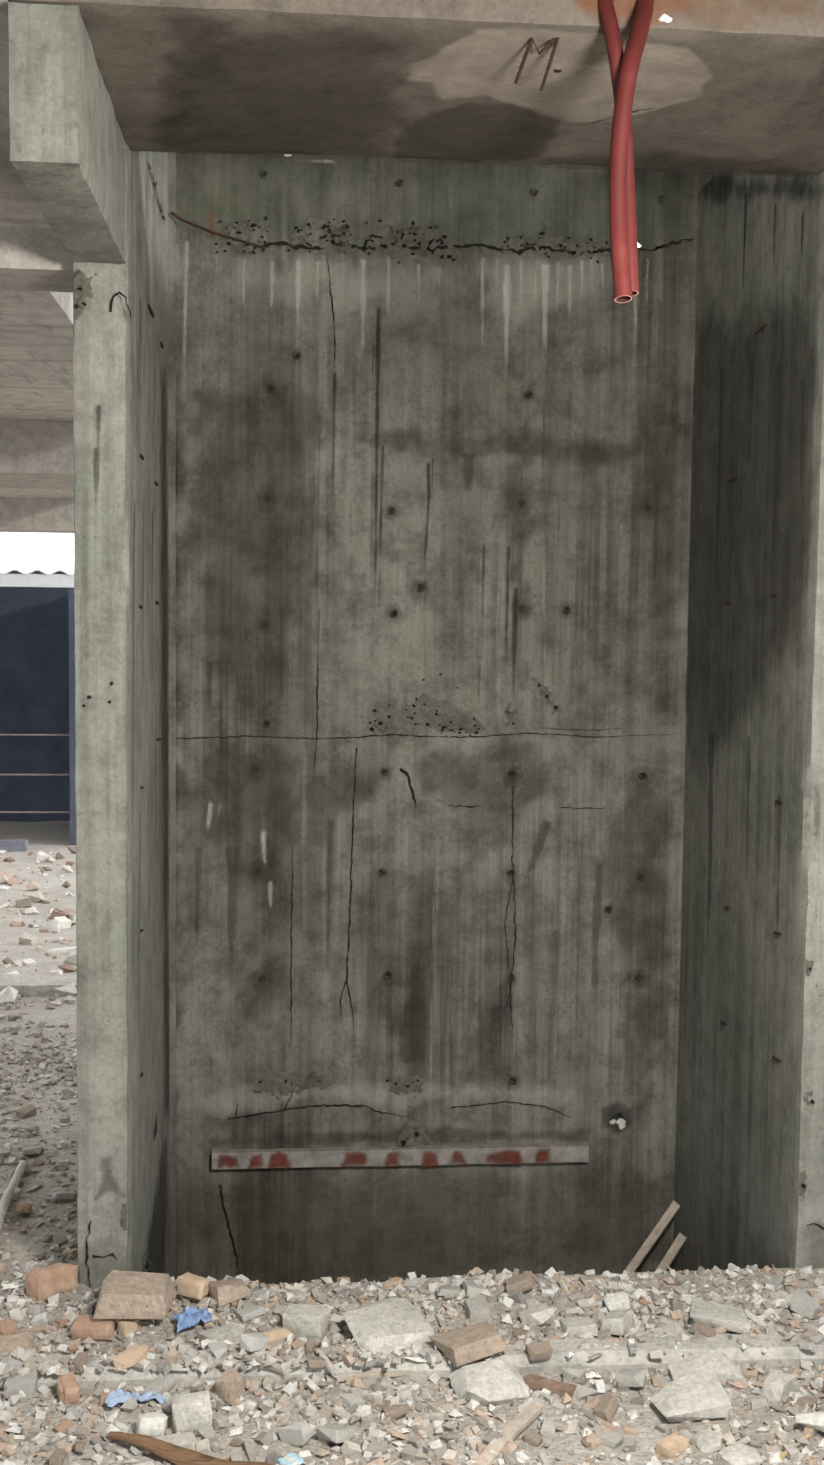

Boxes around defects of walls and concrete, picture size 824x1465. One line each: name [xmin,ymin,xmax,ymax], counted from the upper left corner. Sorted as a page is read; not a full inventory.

spalling [214,216,269,254]
crack [228,846,408,1120]